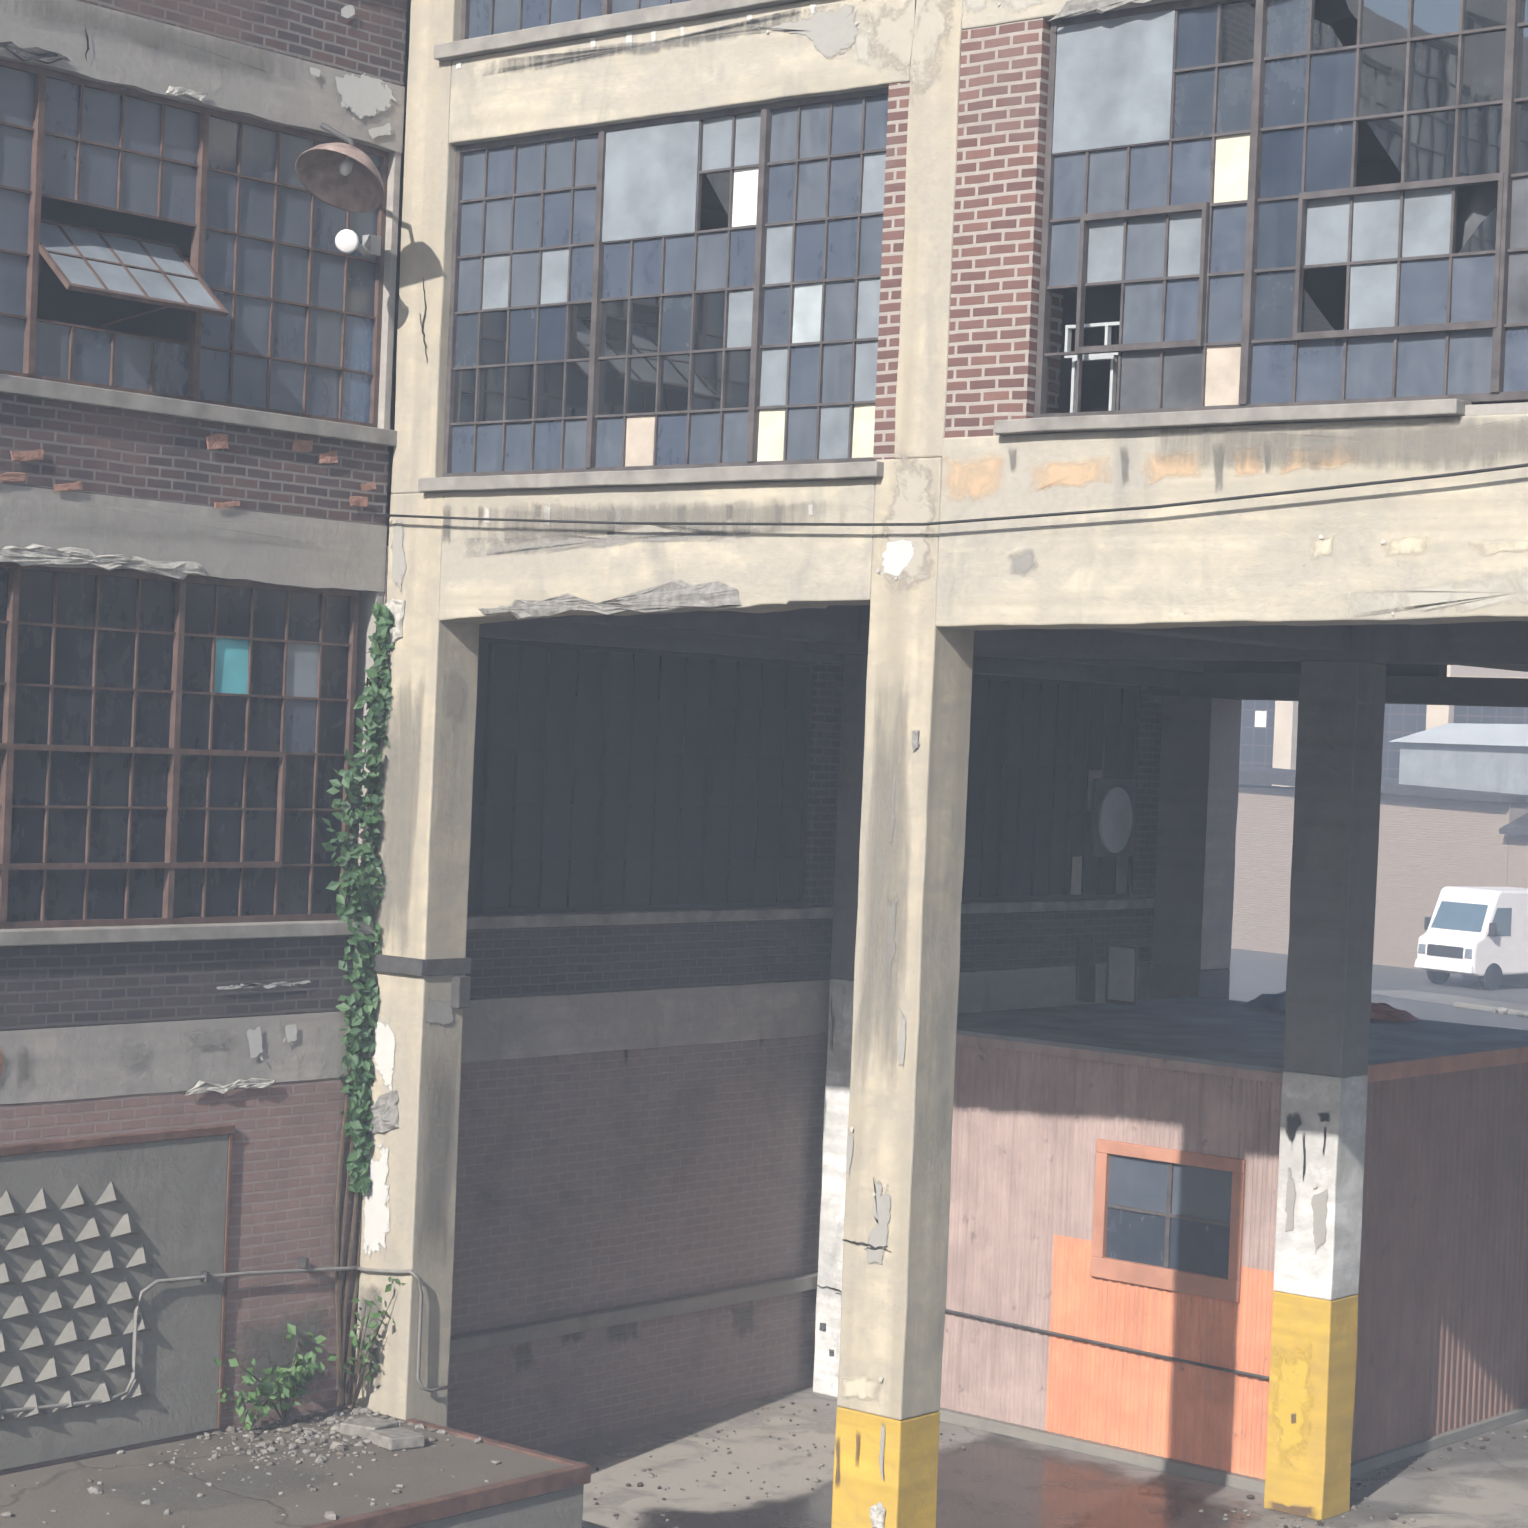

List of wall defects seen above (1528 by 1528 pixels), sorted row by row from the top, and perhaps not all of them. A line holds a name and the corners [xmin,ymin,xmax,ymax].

peeling [758,4,870,63]
peeling [310,67,396,139]
crack [419,278,427,358]
spalling [0,449,44,483]
spalling [205,433,229,450]
spalling [291,439,338,464]
peeling [876,532,921,580]
spalling [185,1026,276,1096]
peeling [283,1024,297,1043]
peeling [363,1018,399,1257]
peeling [867,1177,891,1265]
peeling [1285,1167,1328,1254]